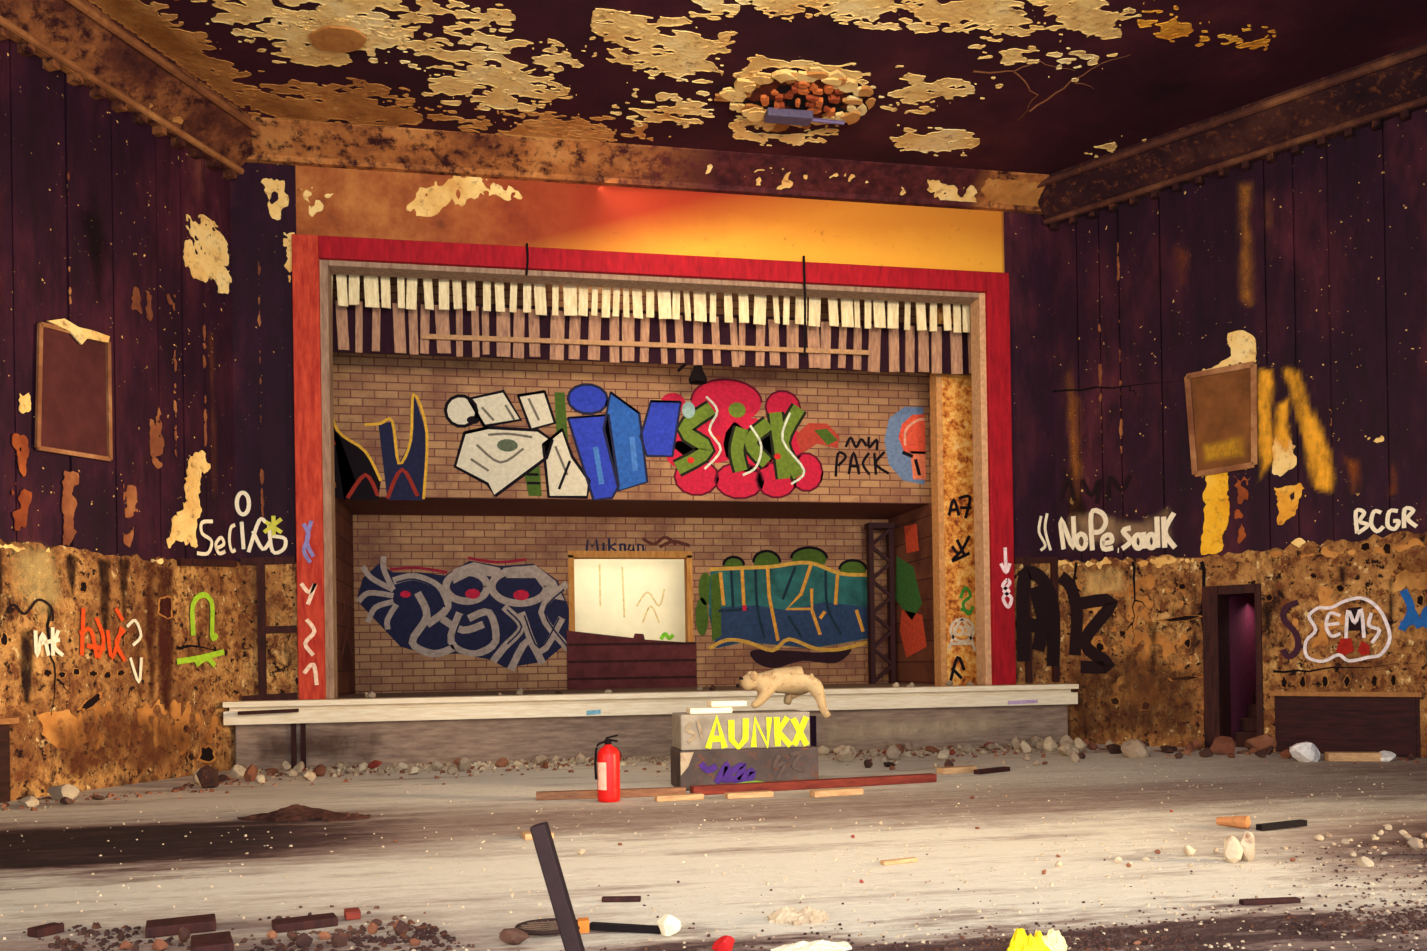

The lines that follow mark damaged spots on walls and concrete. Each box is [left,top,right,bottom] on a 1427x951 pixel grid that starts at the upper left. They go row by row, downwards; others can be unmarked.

peeling [88,0,1276,158]
peeling [183,214,232,294]
peeling [261,178,333,282]
peeling [406,176,523,217]
peeling [149,350,211,564]
peeling [1272,437,1306,525]
spalling [0,632,9,648]
flaking render [36,668,222,763]
flaking render [1058,472,1249,711]
spalling [1281,674,1351,689]
flaking render [1269,538,1427,653]
spalling [1371,674,1396,688]